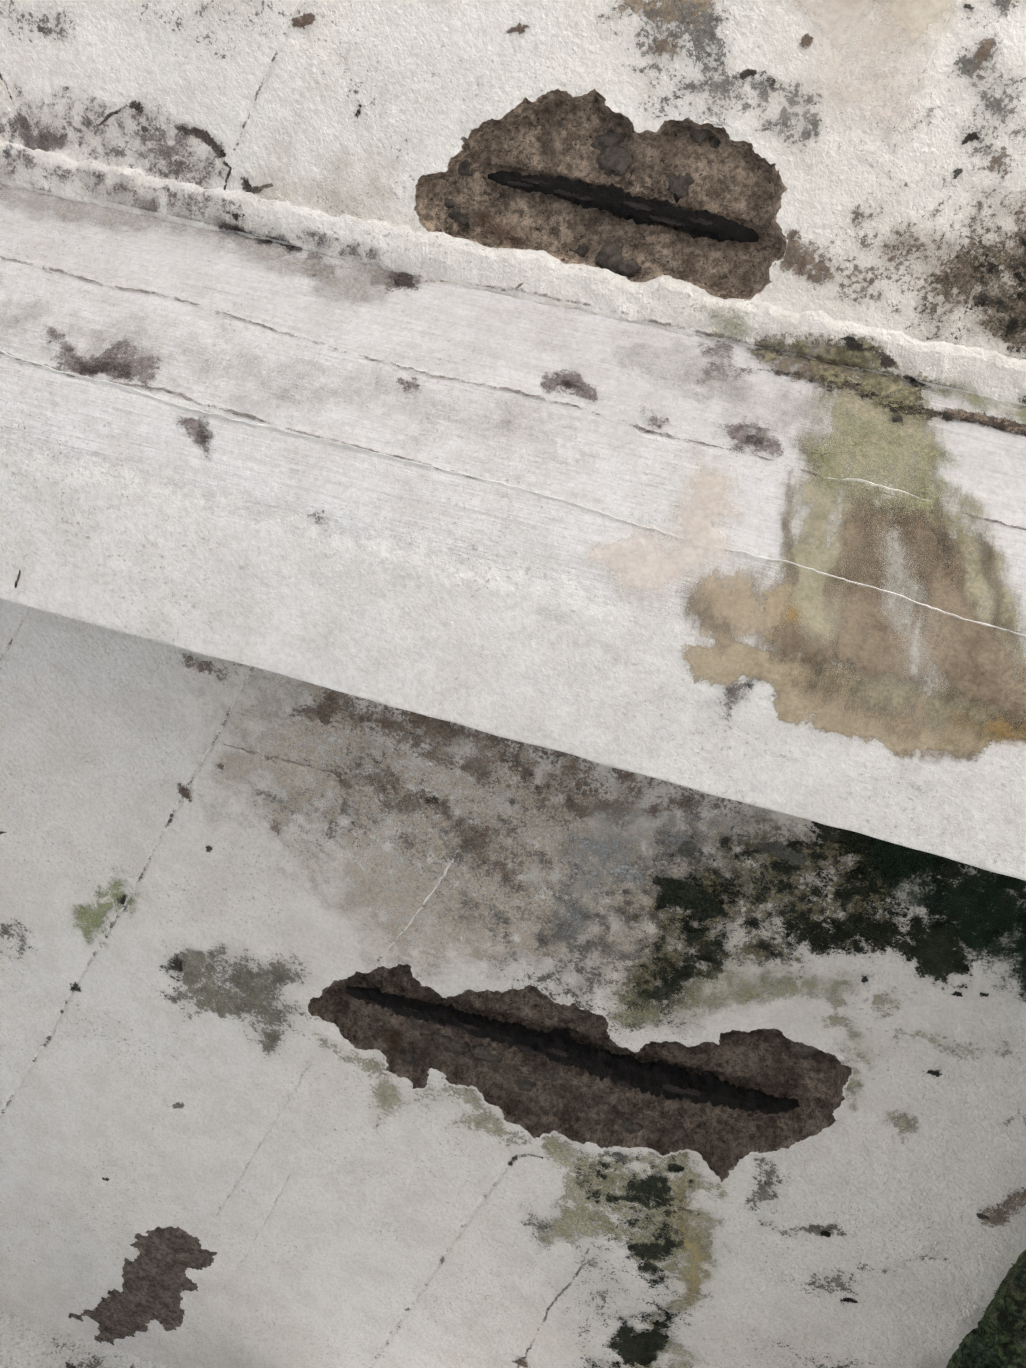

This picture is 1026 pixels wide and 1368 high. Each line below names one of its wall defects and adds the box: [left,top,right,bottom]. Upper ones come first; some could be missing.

spalling [413,89,788,301]
water stain [775,0,1026,360]
water stain [597,310,1026,760]
water stain [254,688,909,1040]
water stain [159,941,318,1058]
spalling [308,963,852,1182]
water stain [866,988,974,1061]
peeling [68,1226,217,1346]
water stain [521,1135,727,1368]
water stain [744,1158,847,1237]